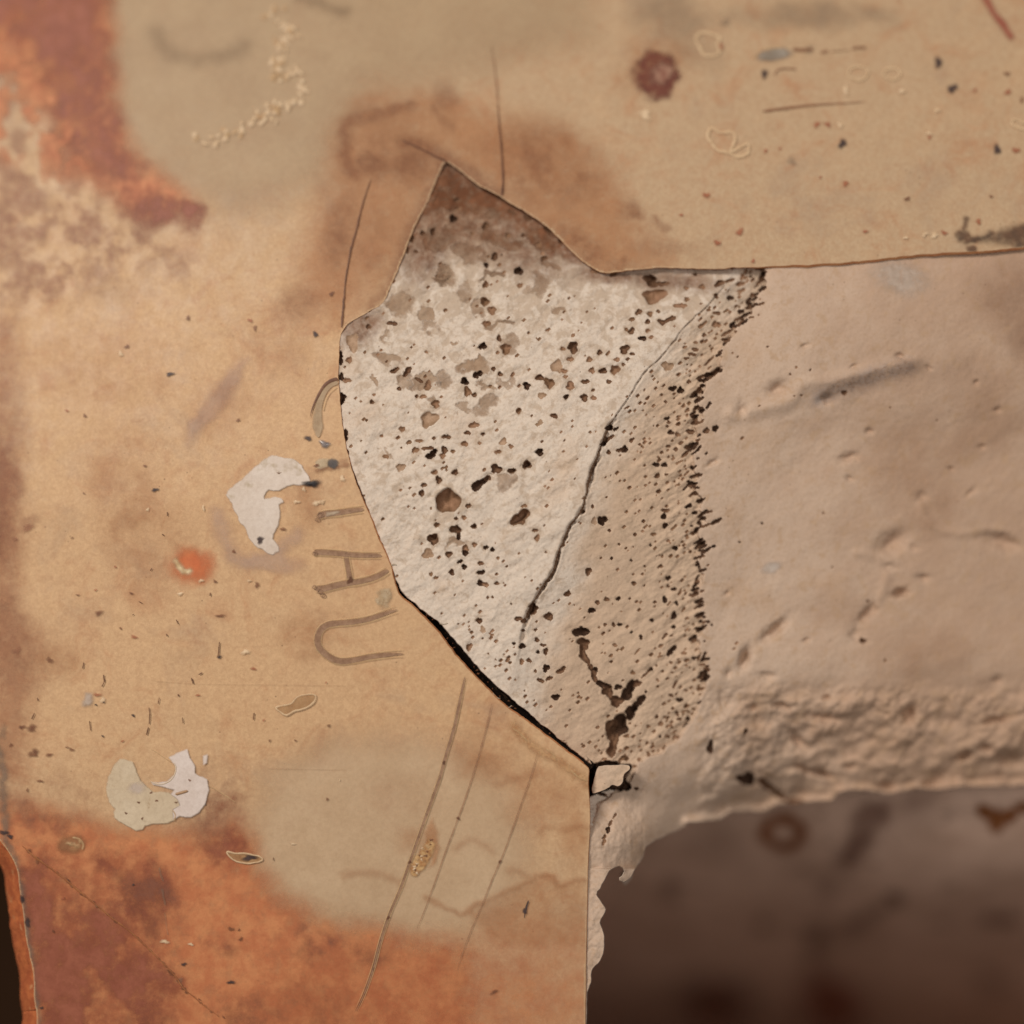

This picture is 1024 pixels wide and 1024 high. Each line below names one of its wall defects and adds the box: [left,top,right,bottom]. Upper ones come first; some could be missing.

rust [0,0,203,227]
rust [636,51,680,100]
damp [407,163,581,268]
peeling [226,455,310,554]
crack [526,302,711,618]
spalling [338,162,1024,804]
peeling [106,749,209,831]